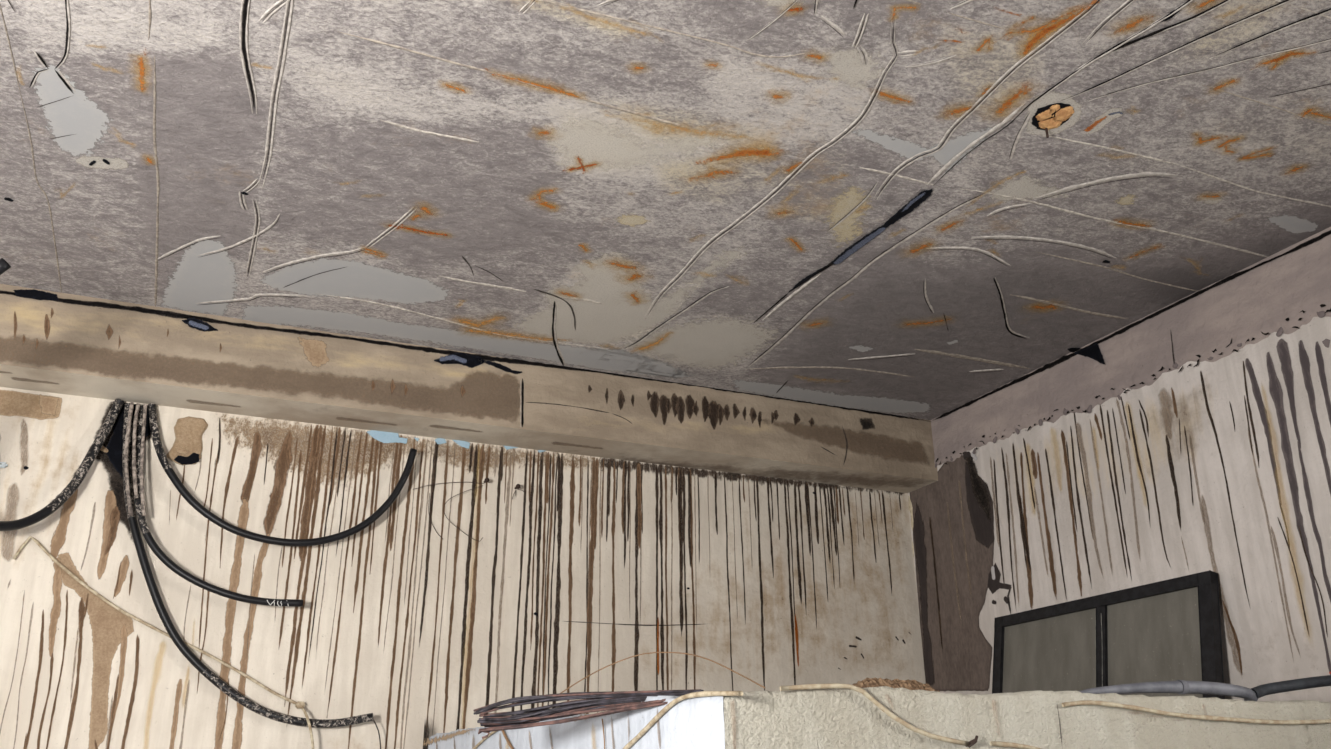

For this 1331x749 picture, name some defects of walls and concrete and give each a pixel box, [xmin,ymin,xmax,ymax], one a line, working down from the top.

crack [29,0,76,107]
crack [158,0,417,305]
rust [645,121,781,179]
crack [749,0,1331,367]
rust [1002,0,1099,55]
spalling [1026,92,1123,138]
rust [1251,51,1309,70]
leakage [0,308,927,749]
peeling [896,304,1331,691]
leakage [990,388,1242,674]
leakage [1200,371,1250,606]
leakage [1229,339,1331,675]